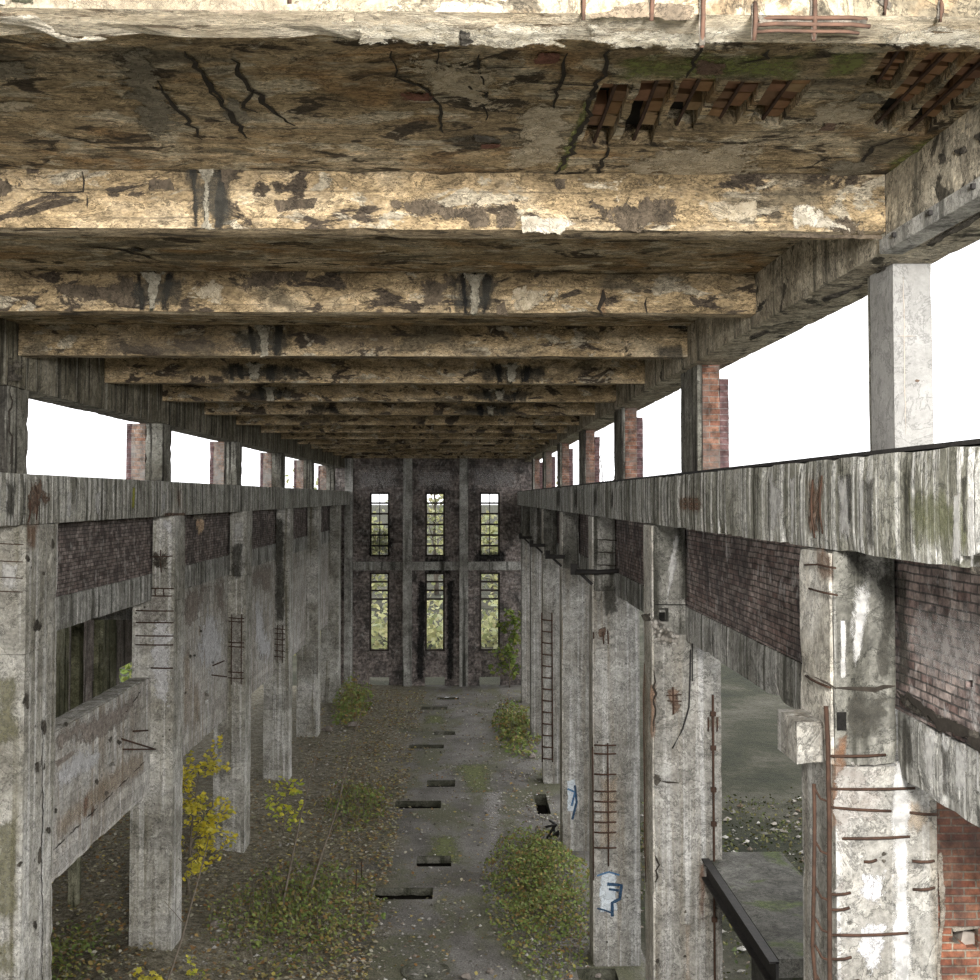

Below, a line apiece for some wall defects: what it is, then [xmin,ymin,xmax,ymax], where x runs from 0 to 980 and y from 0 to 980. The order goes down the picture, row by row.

peeling [581,0,737,50]
crack [157,81,202,140]
crack [184,51,296,138]
flaking render [332,20,811,175]
crack [554,50,611,174]
crack [686,48,703,78]
crack [739,50,770,64]
flaking render [751,0,980,176]
leakage [185,169,230,230]
corrosion [808,475,823,538]